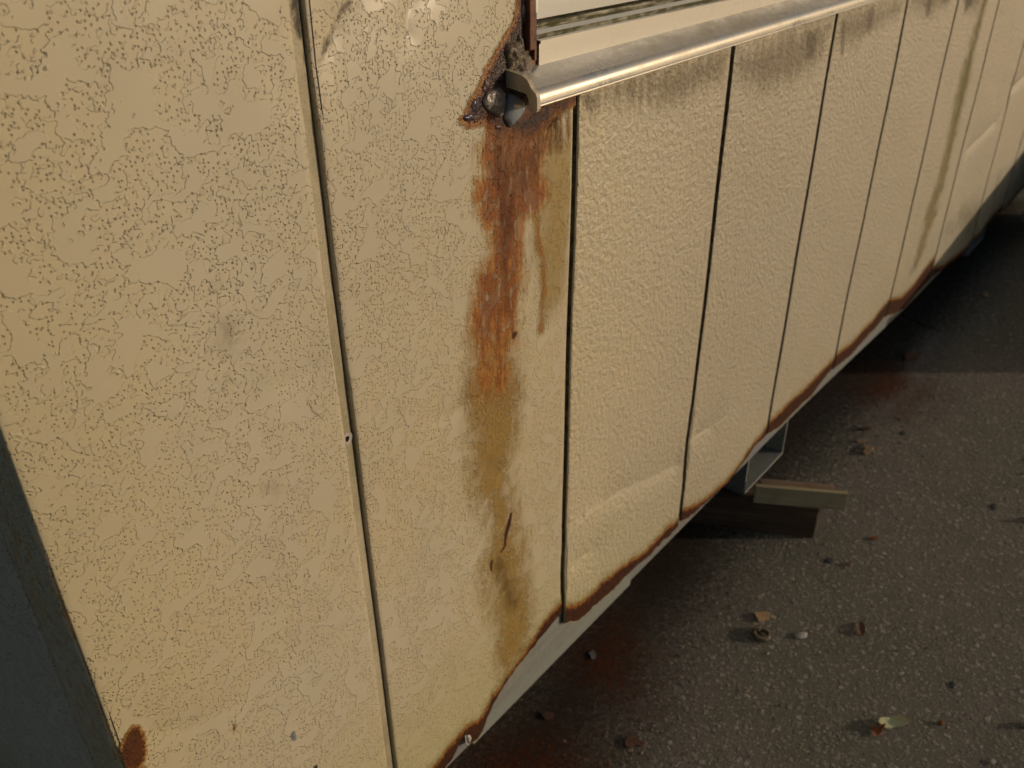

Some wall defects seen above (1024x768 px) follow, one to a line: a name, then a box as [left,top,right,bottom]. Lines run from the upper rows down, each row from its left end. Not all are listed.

rust [120,725,148,768]
rust [433,0,1003,768]